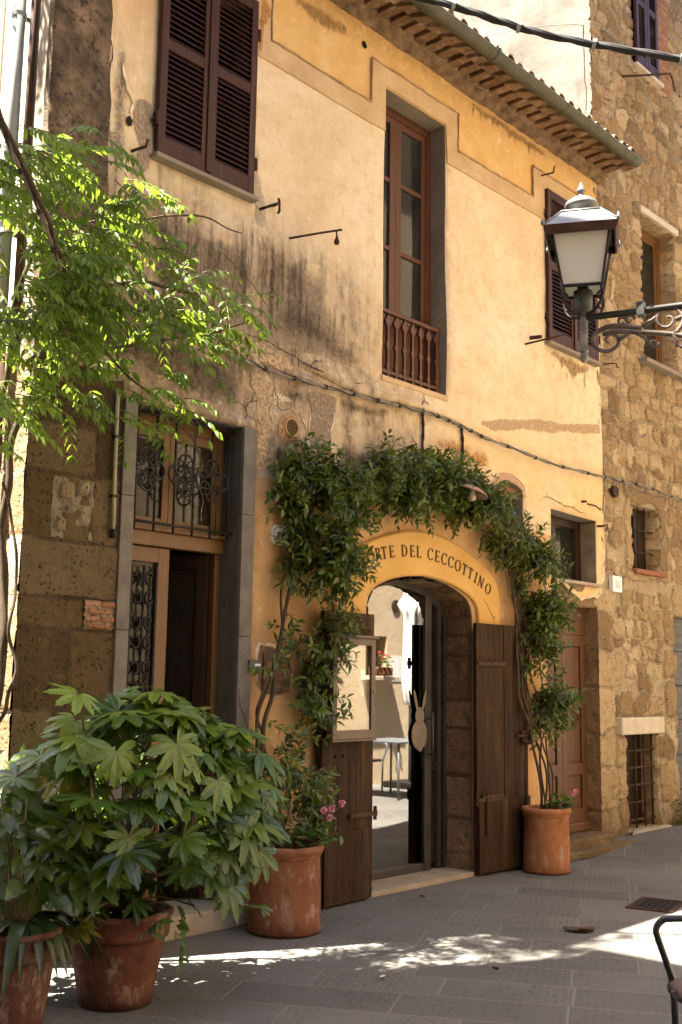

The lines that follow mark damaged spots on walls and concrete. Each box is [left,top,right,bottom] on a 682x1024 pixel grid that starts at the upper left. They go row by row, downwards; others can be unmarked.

damp [153,204,349,359]
crack [234,380,289,426]
spalling [50,475,95,542]
spalling [83,600,115,630]